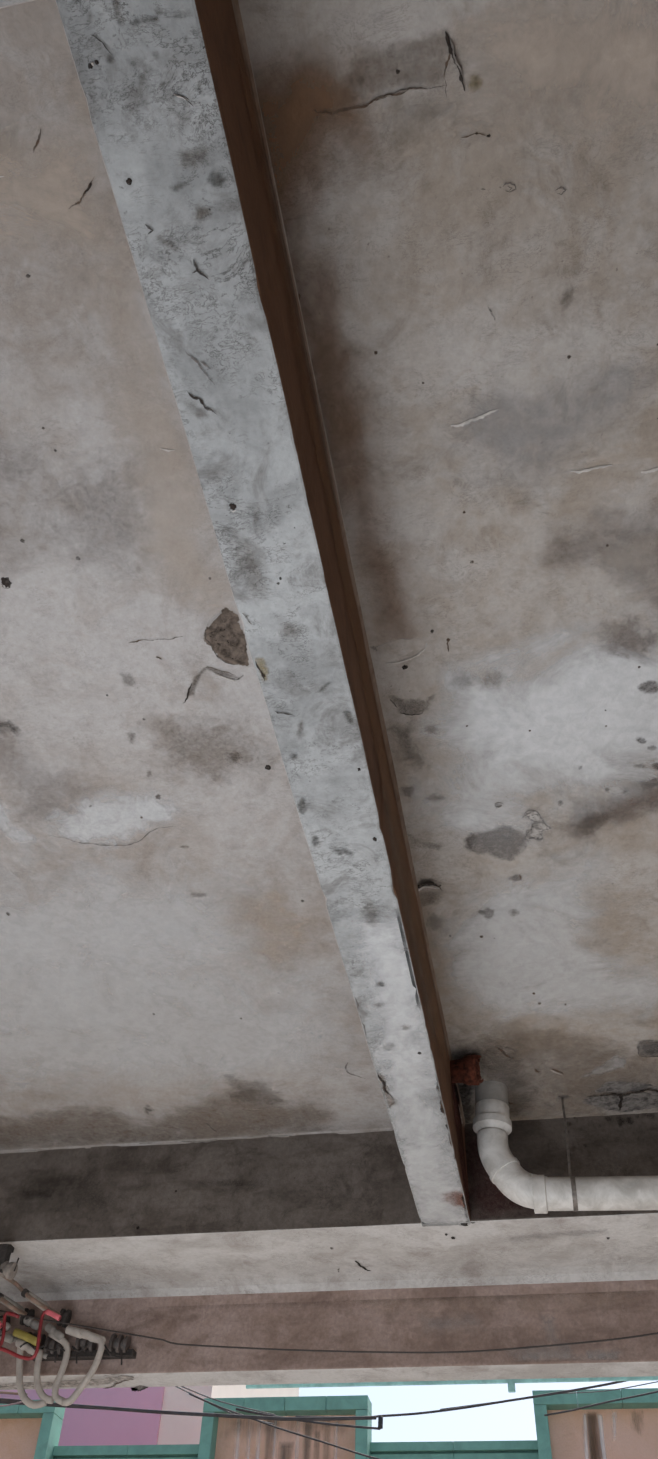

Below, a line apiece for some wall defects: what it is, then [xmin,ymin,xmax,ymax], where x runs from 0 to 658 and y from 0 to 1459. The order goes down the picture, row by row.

spalling [184,607,267,703]
water stain [639,681,658,692]
peeling [55,794,175,846]
water stain [577,739,658,833]
spalling [583,1040,658,1112]
water stain [0,1093,321,1143]